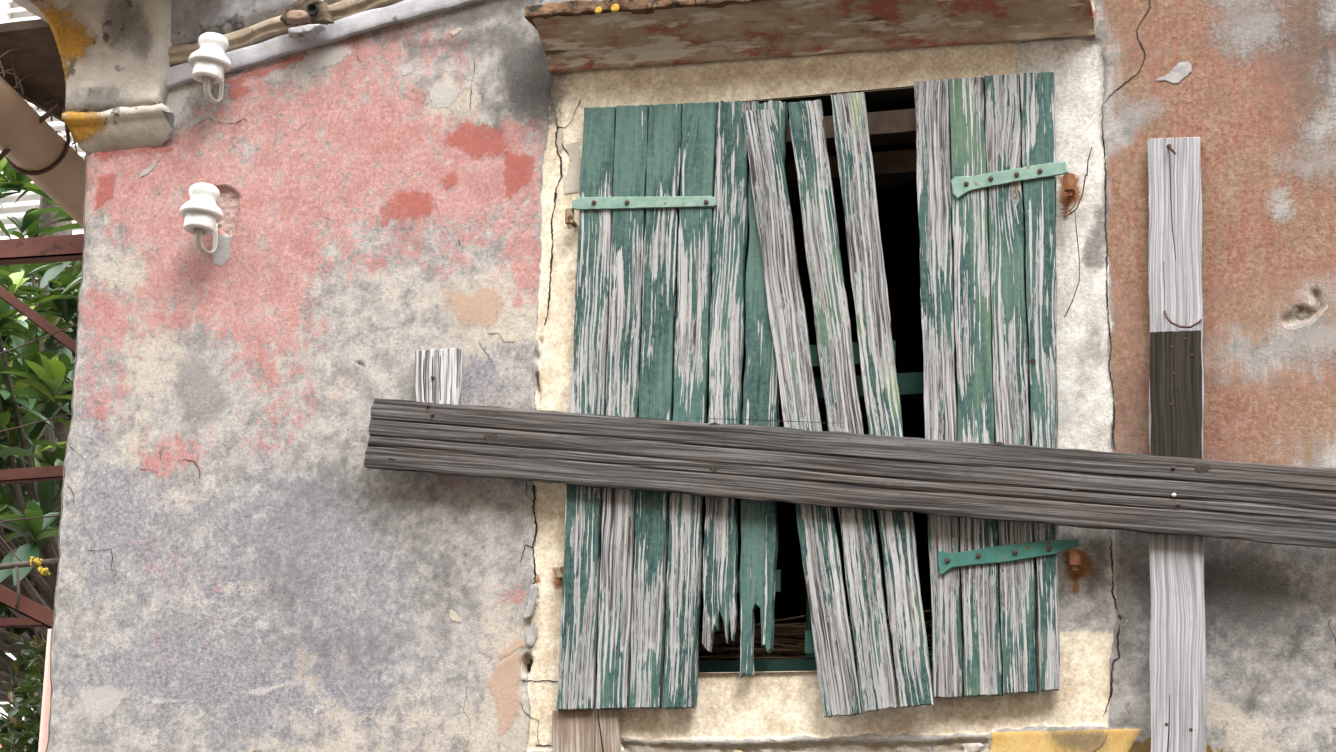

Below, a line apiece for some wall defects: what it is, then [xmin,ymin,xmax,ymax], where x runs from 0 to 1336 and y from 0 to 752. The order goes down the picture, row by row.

peeling [297,46,351,84]
peeling [1154,62,1192,83]
peeling [95,173,116,209]
spalling [211,184,243,267]
peeling [503,150,534,198]
crack [544,93,581,325]
corrosion [1059,176,1080,219]
spalling [1277,285,1328,330]
crack [1225,492,1336,506]
corrosion [1064,550,1092,593]
peeling [486,583,540,734]
spalling [621,735,992,752]